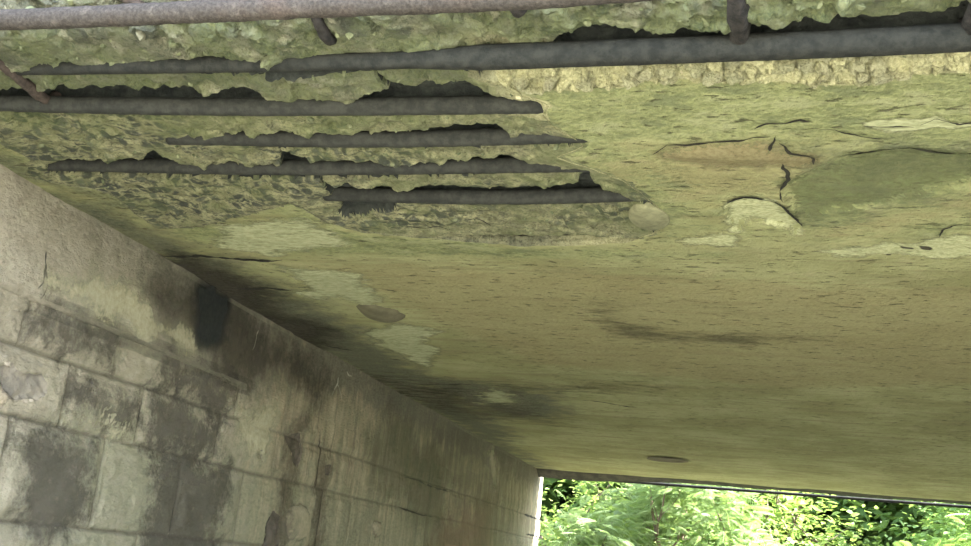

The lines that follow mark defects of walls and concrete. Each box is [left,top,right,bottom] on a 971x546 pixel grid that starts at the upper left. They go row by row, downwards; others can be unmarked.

spalling [0,0,971,239]
crack [654,119,971,227]
damp [212,218,383,305]
peeling [677,198,802,247]
peeling [818,234,971,259]
spalling [0,361,47,406]
damp [24,254,340,546]
damp [365,324,443,367]
damp [470,387,521,405]
damp [6,423,98,546]